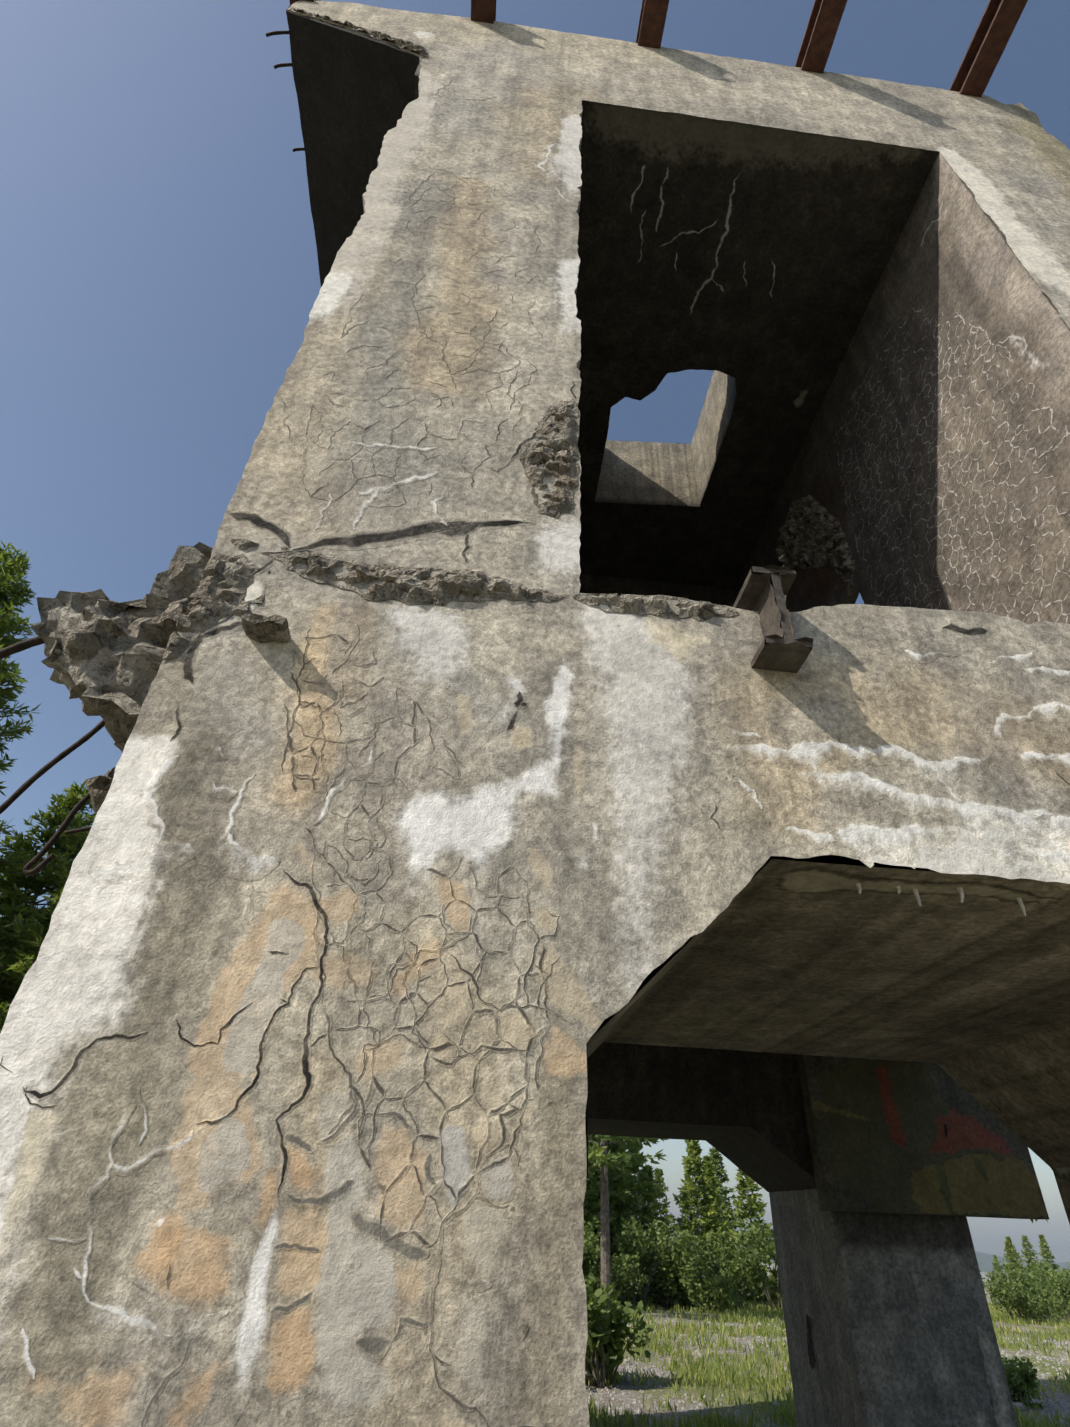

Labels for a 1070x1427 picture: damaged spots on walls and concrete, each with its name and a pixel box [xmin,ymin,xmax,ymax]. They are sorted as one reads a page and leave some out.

crack [435,80,496,108]
crack [226,165,578,577]
spalling [519,399,580,518]
spalling [775,494,855,586]
damp [366,512,726,1019]
spalling [22,793,92,876]
damp [774,820,1070,905]
crack [0,619,573,1427]
damp [555,1016,593,1046]